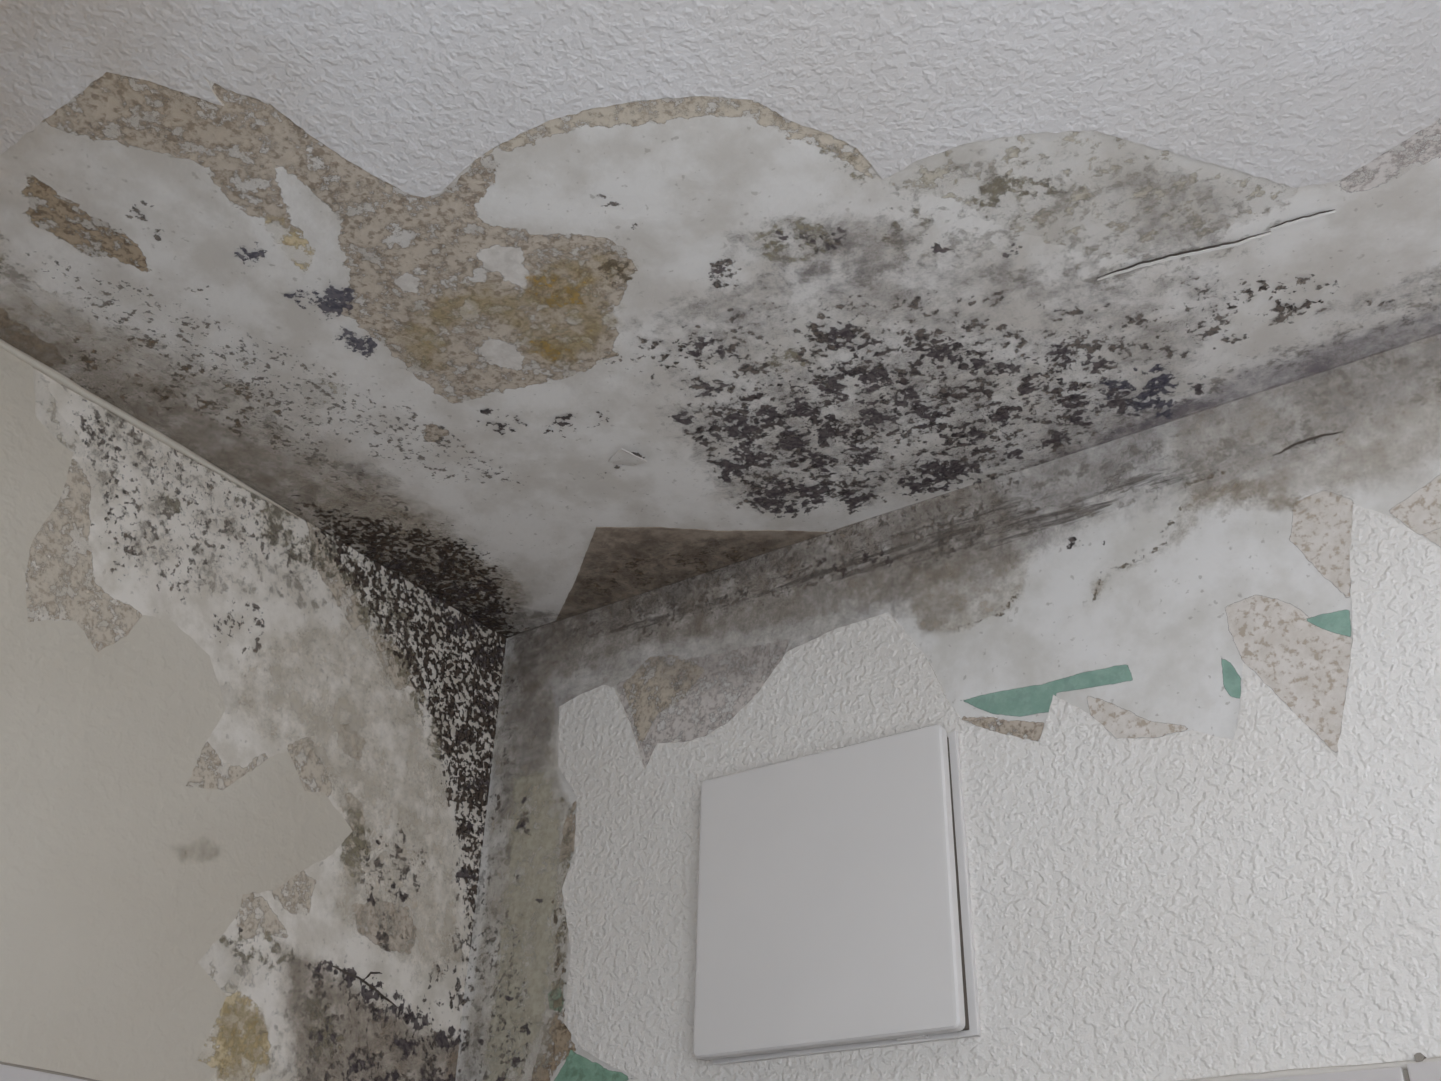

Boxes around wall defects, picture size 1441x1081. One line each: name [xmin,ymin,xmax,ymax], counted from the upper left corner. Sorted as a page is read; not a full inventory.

damp [973,174,1066,207]
damp [126,201,161,241]
damp [758,218,853,272]
damp [2,235,1441,1081]